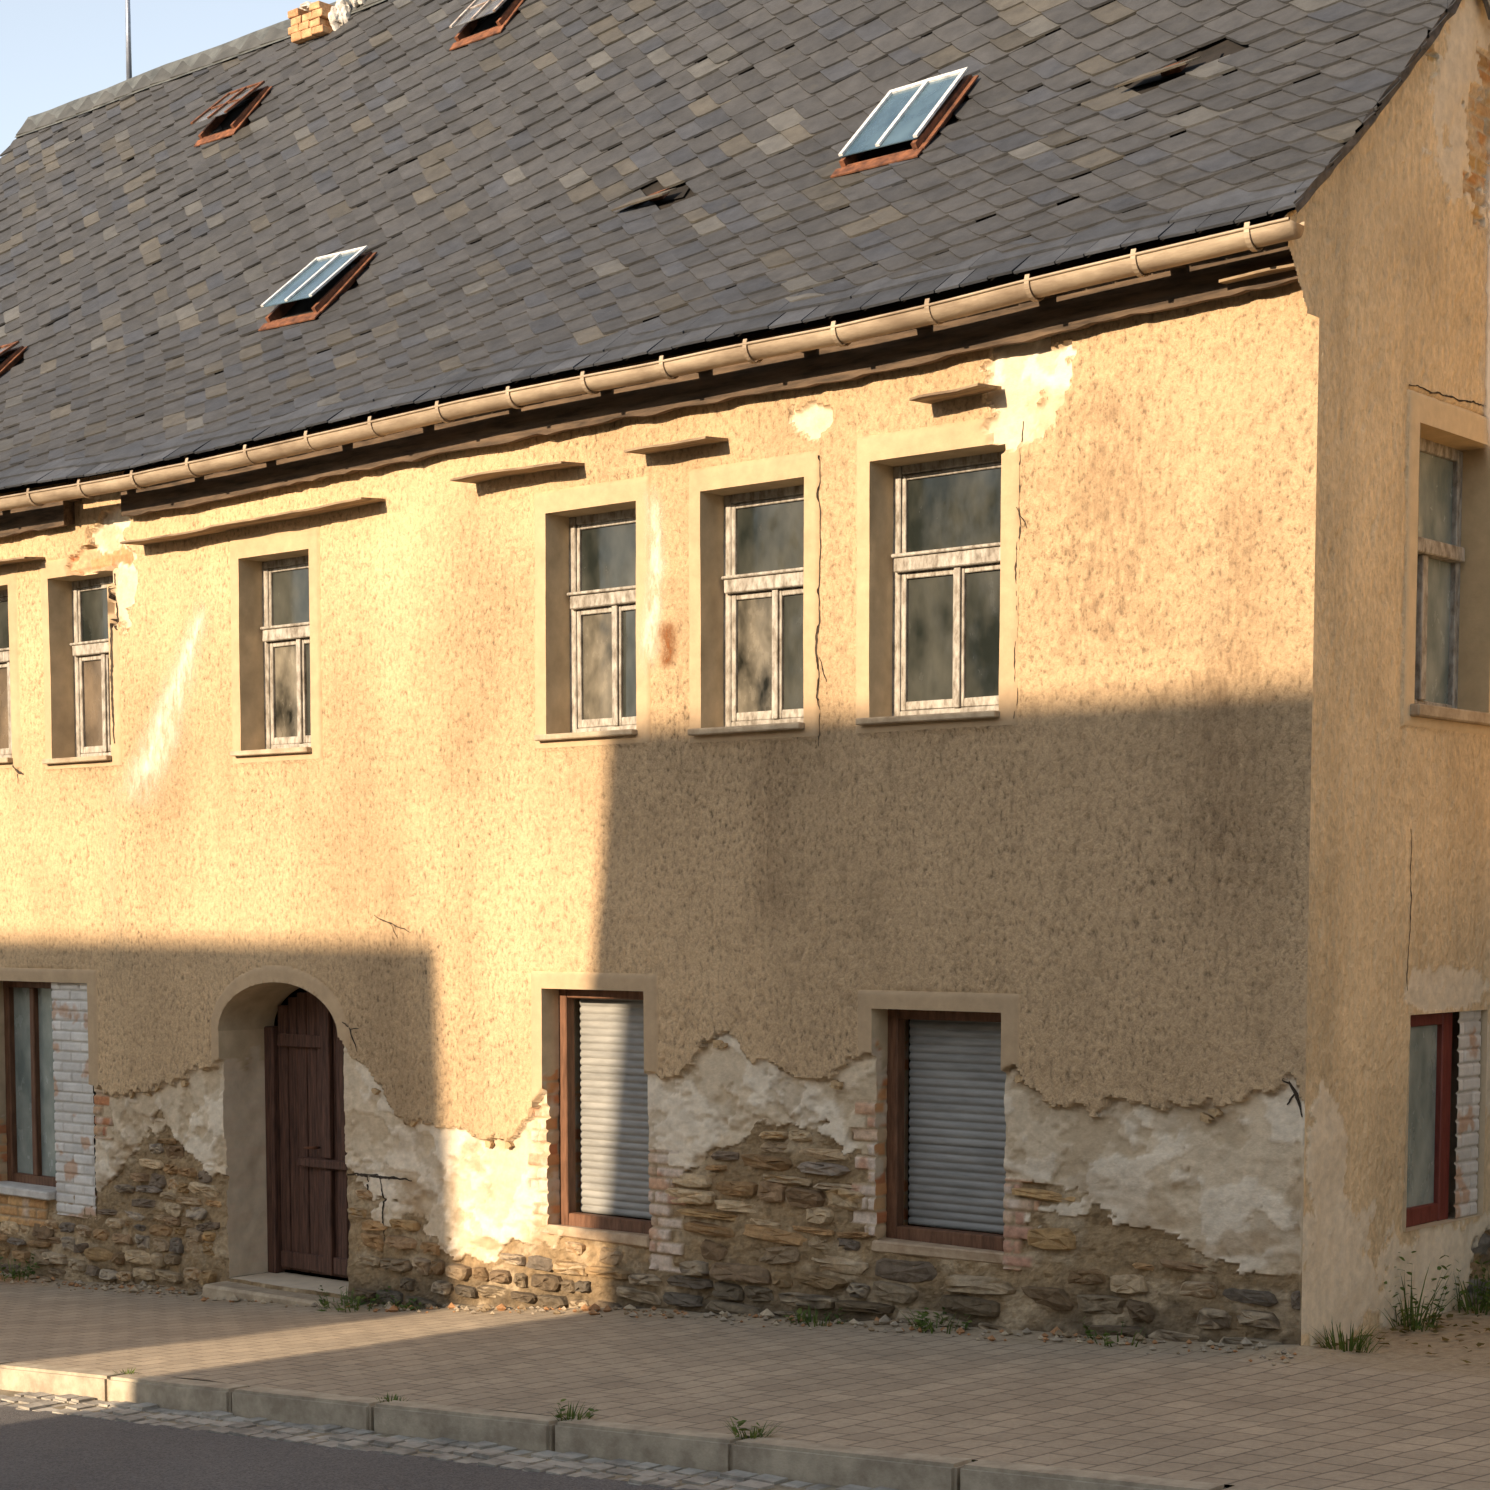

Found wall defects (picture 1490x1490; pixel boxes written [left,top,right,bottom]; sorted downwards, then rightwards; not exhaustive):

flaking render [1423,0,1490,232]
flaking render [980,337,1077,450]
flaking render [65,506,138,633]
damp [130,613,204,794]
rust [662,625,673,664]
flaking render [0,1031,1490,1347]